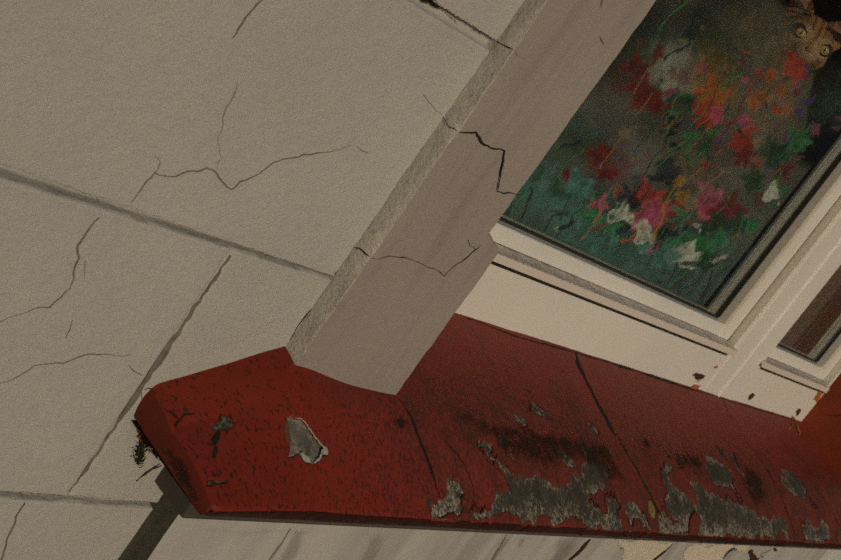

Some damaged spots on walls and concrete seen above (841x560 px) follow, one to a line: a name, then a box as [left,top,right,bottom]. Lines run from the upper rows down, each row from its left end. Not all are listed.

crack [232,0,262,39]
crack [423,94,518,195]
crack [354,240,477,276]
crack [0,84,369,560]
peeling [284,416,328,465]
crack [399,399,440,498]
damp [483,422,622,478]
peeling [427,439,789,560]
crack [467,318,799,533]
peeling [800,518,840,543]